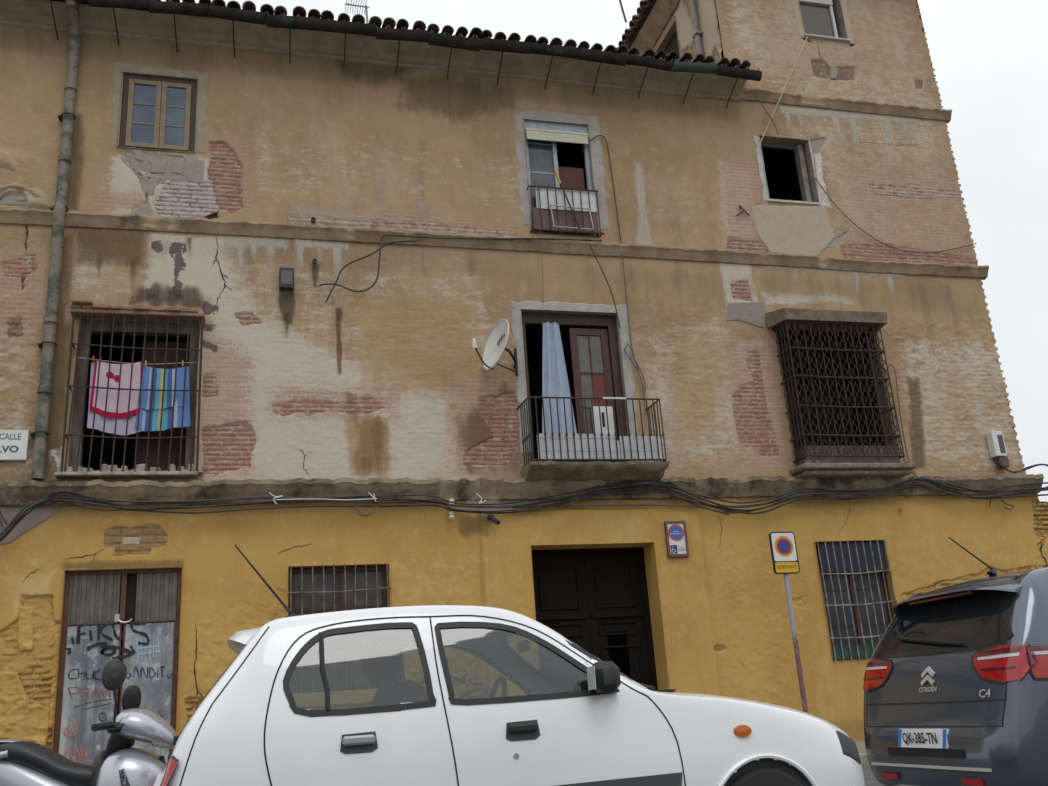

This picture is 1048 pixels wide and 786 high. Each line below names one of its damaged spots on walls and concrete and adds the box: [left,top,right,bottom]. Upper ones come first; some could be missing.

flaking render [121,142,243,219]
crack [212,238,232,302]
flaking render [201,423,256,475]
flaking render [271,396,386,416]
flaking render [463,392,520,469]
flaking render [732,350,780,457]
flaking render [104,524,168,556]
peeling [0,624,61,747]